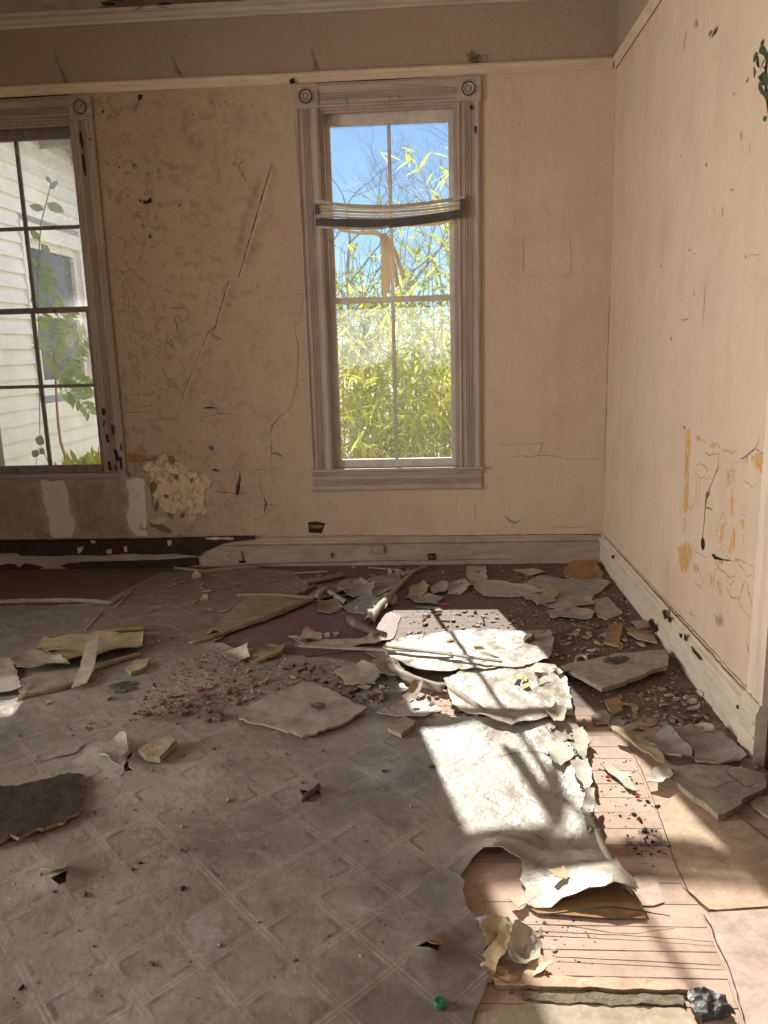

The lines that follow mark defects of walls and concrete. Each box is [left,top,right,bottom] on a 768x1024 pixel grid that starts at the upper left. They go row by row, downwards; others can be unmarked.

crack [250,122,314,517]
peeling [102,408,123,471]
peeling [0,453,256,570]
crack [492,300,610,478]
crack [701,442,763,550]
peeling [648,609,671,633]